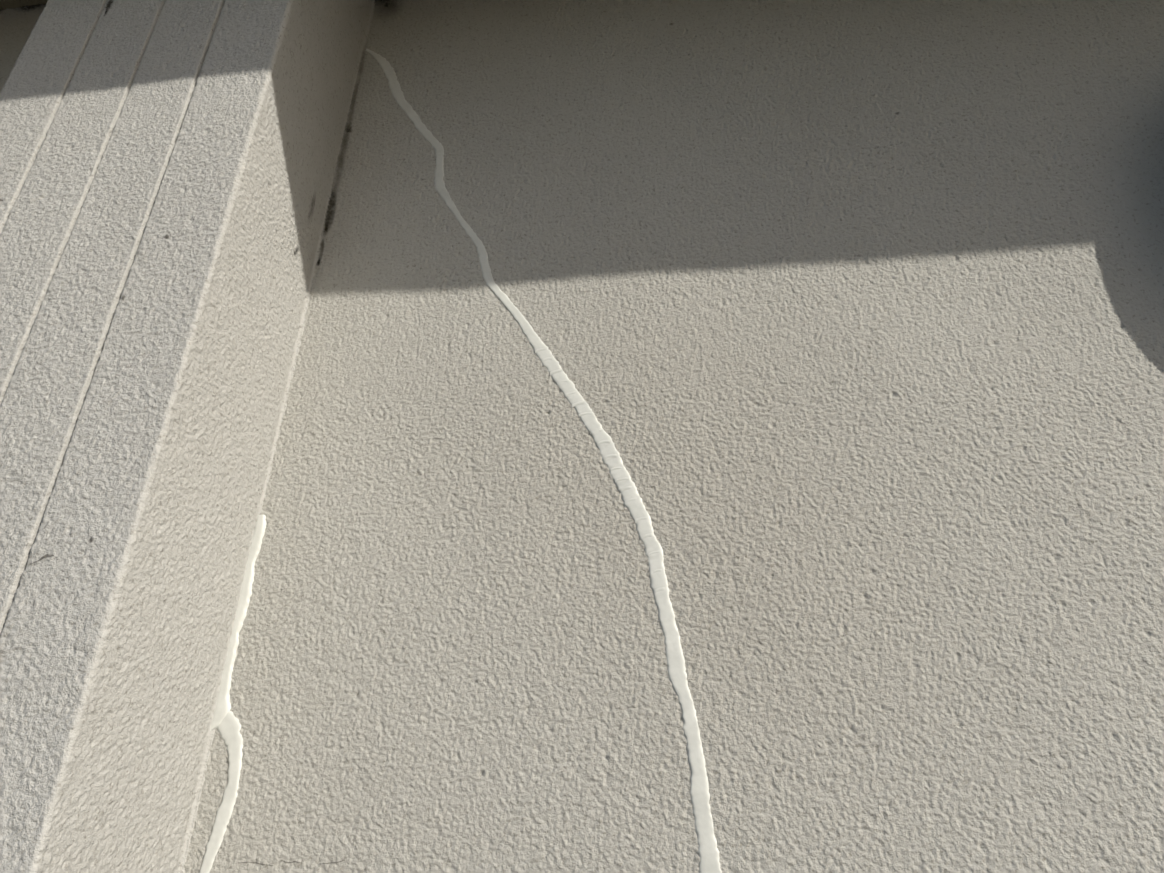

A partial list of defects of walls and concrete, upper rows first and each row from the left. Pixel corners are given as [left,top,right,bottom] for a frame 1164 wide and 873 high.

crack [199,515,267,873]
crack [365,49,722,873]